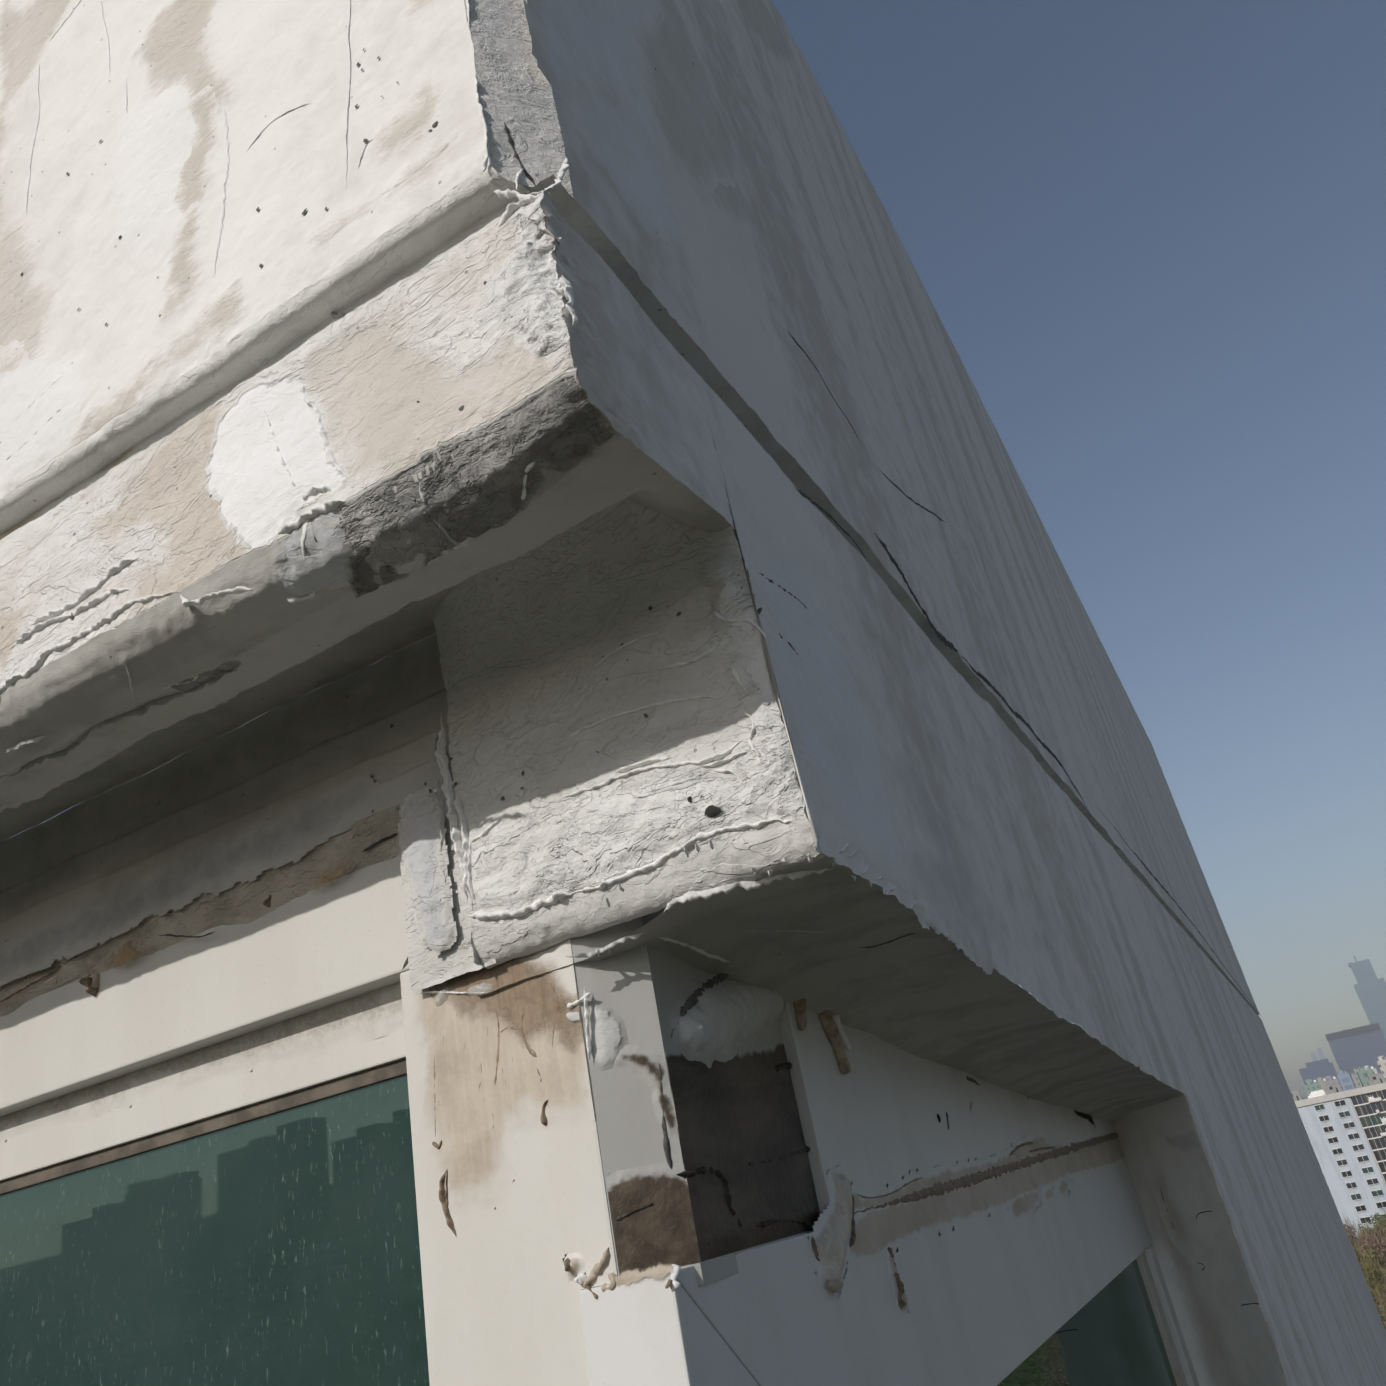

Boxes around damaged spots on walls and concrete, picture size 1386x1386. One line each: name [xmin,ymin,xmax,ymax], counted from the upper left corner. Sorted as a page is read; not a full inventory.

crack [789,333,862,444]
peeling [282,296,618,597]
crack [881,471,943,521]
peeling [0,583,41,682]
spalling [170,658,248,694]
crack [759,573,807,609]
crack [796,488,1261,1015]
peeling [566,986,591,1061]
water stain [0,946,595,1218]
peeling [665,1264,681,1292]